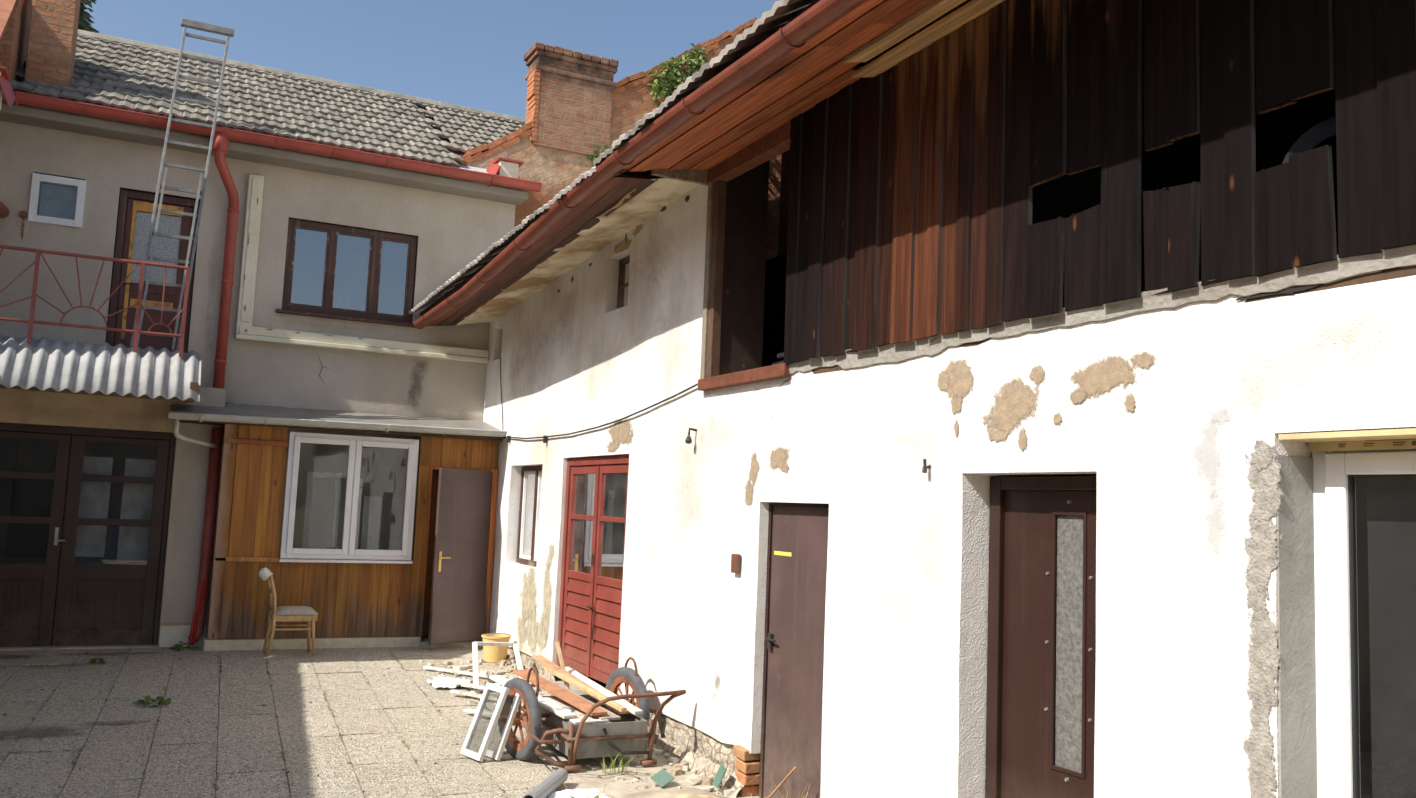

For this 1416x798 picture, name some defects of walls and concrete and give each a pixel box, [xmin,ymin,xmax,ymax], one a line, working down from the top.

peeling [1130,351,1155,369]
peeling [1029,364,1045,385]
peeling [936,371,962,437]
peeling [1124,393,1135,412]
peeling [988,428,1027,451]
peeling [744,478,753,505]
flaking render [1243,438,1283,798]